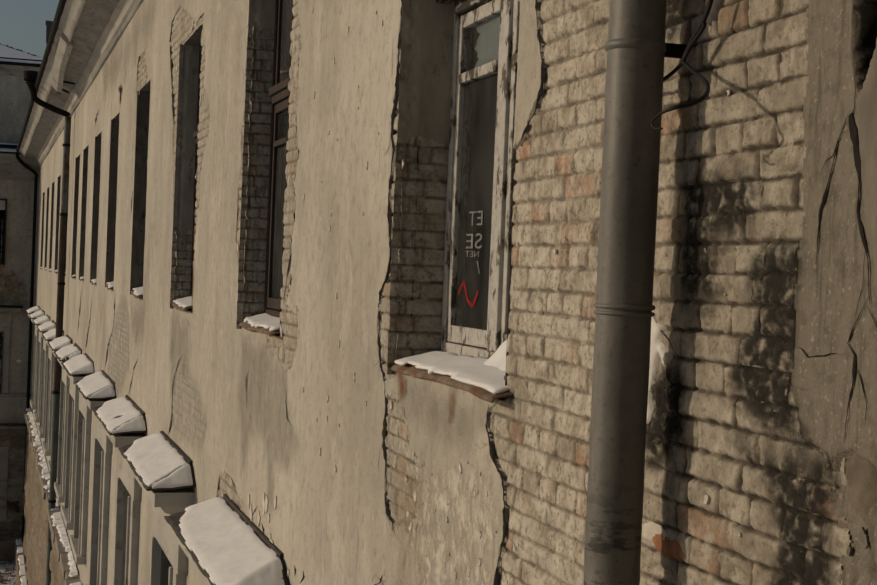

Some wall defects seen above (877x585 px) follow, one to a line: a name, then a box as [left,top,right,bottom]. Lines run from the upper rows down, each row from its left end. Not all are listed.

flaking render [170,7,210,286]
flaking render [235,26,254,305]
flaking render [265,0,305,373]
flaking render [376,0,610,585]
flaking render [640,0,877,585]
crack [793,77,877,441]